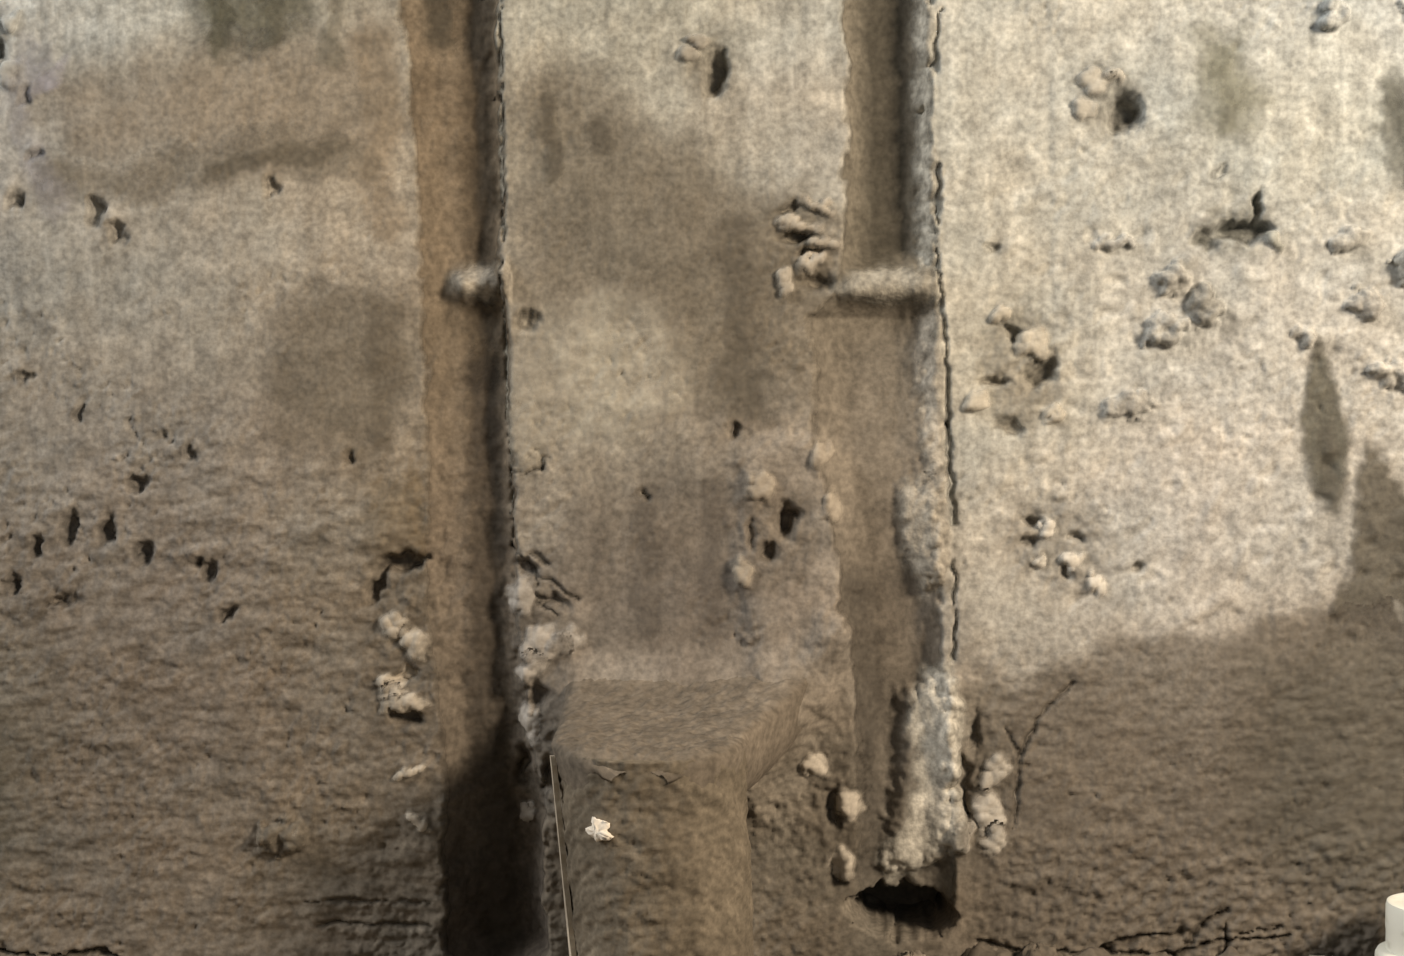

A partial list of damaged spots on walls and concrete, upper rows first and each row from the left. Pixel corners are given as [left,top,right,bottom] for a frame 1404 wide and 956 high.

flaking render [776,196,840,297]
flaking render [370,551,424,598]
flaking render [377,612,430,722]
flaking render [507,560,585,823]
water stain [977,343,1404,956]
flaking render [393,765,426,781]
flaking render [406,813,430,833]
flaking render [946,717,1012,855]
crack [1005,683,1072,823]